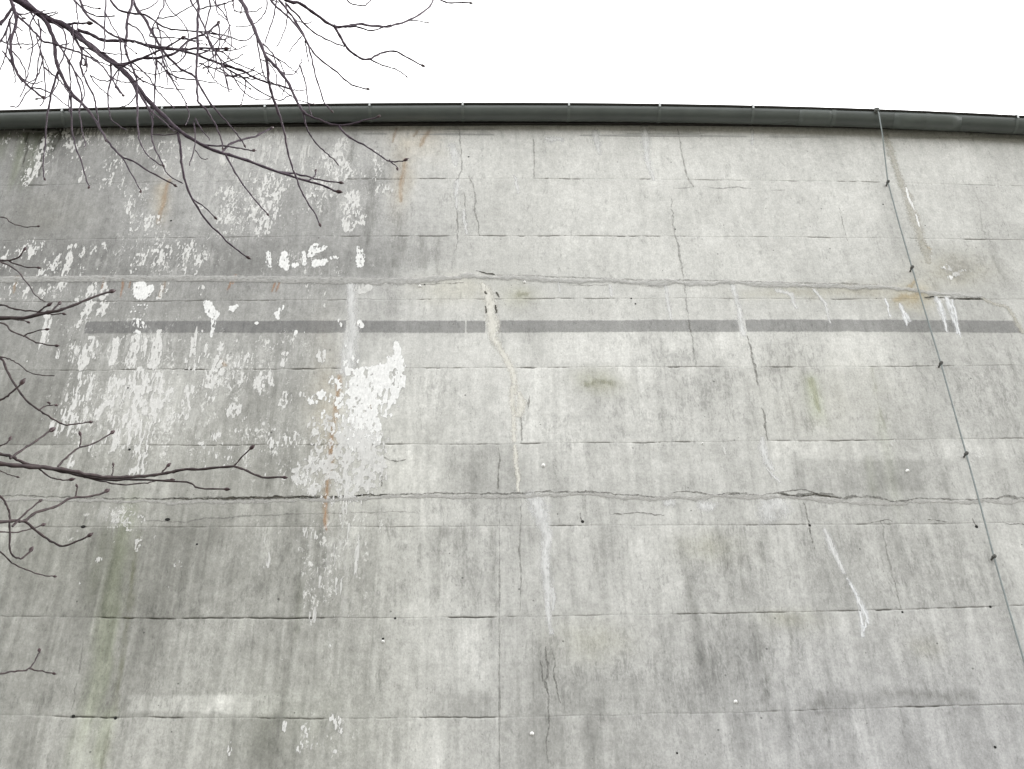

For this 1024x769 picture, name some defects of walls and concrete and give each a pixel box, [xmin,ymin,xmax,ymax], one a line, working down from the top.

peeling [21,127,397,475]
damp [885,298,911,325]
damp [934,296,961,338]
crack [925,293,984,301]
damp [481,283,556,634]
crack [0,459,1024,542]
damp [823,529,869,637]